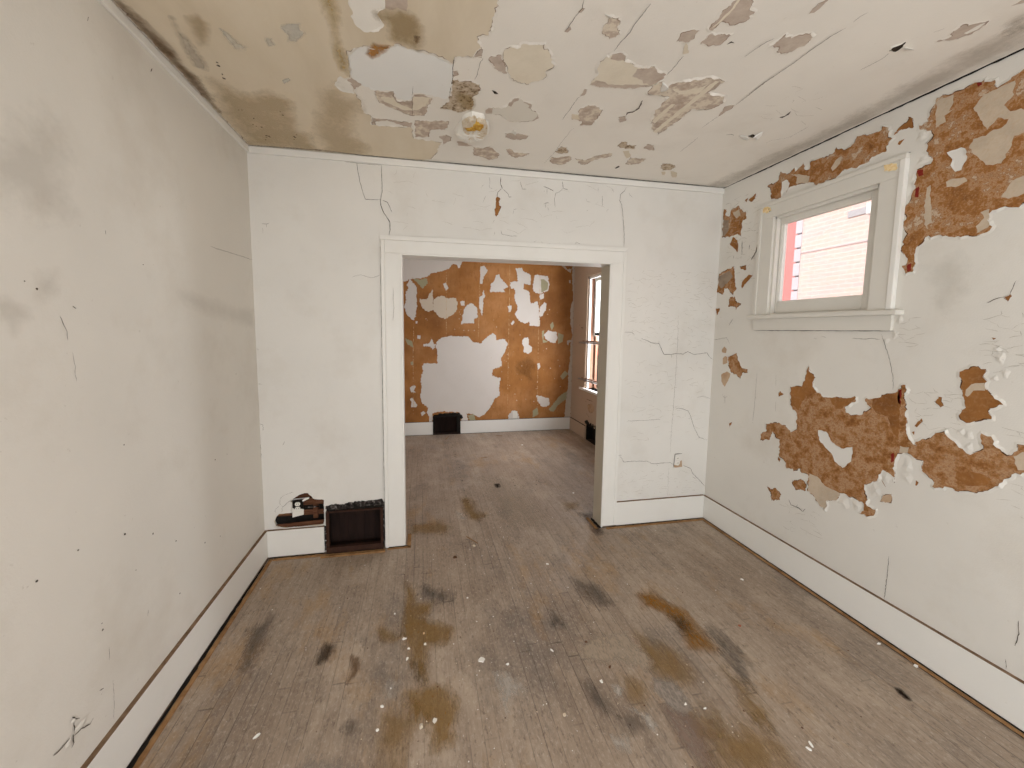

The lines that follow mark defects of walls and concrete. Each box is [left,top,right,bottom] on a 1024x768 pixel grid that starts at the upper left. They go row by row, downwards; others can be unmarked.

peeling [111,0,557,163]
peeling [548,14,737,169]
peeling [675,0,758,54]
crack [357,163,390,233]
peeling [660,163,677,177]
peeling [721,66,1024,276]
peeling [404,261,575,422]
peeling [716,264,753,315]
peeling [721,346,749,387]
peeling [759,363,1024,519]